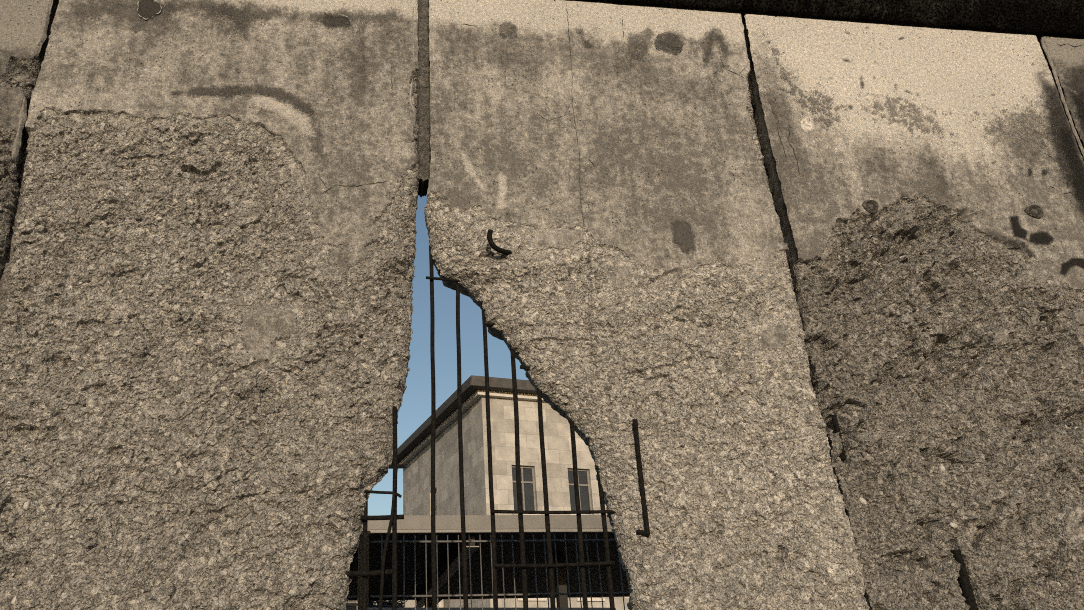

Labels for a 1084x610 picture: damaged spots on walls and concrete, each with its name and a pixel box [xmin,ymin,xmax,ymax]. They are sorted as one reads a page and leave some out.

spalling [0,54,41,99]
water stain [703,28,729,67]
water stain [1043,69,1084,213]
water stain [672,219,696,253]
spalling [0,68,419,610]
spalling [424,190,1084,610]